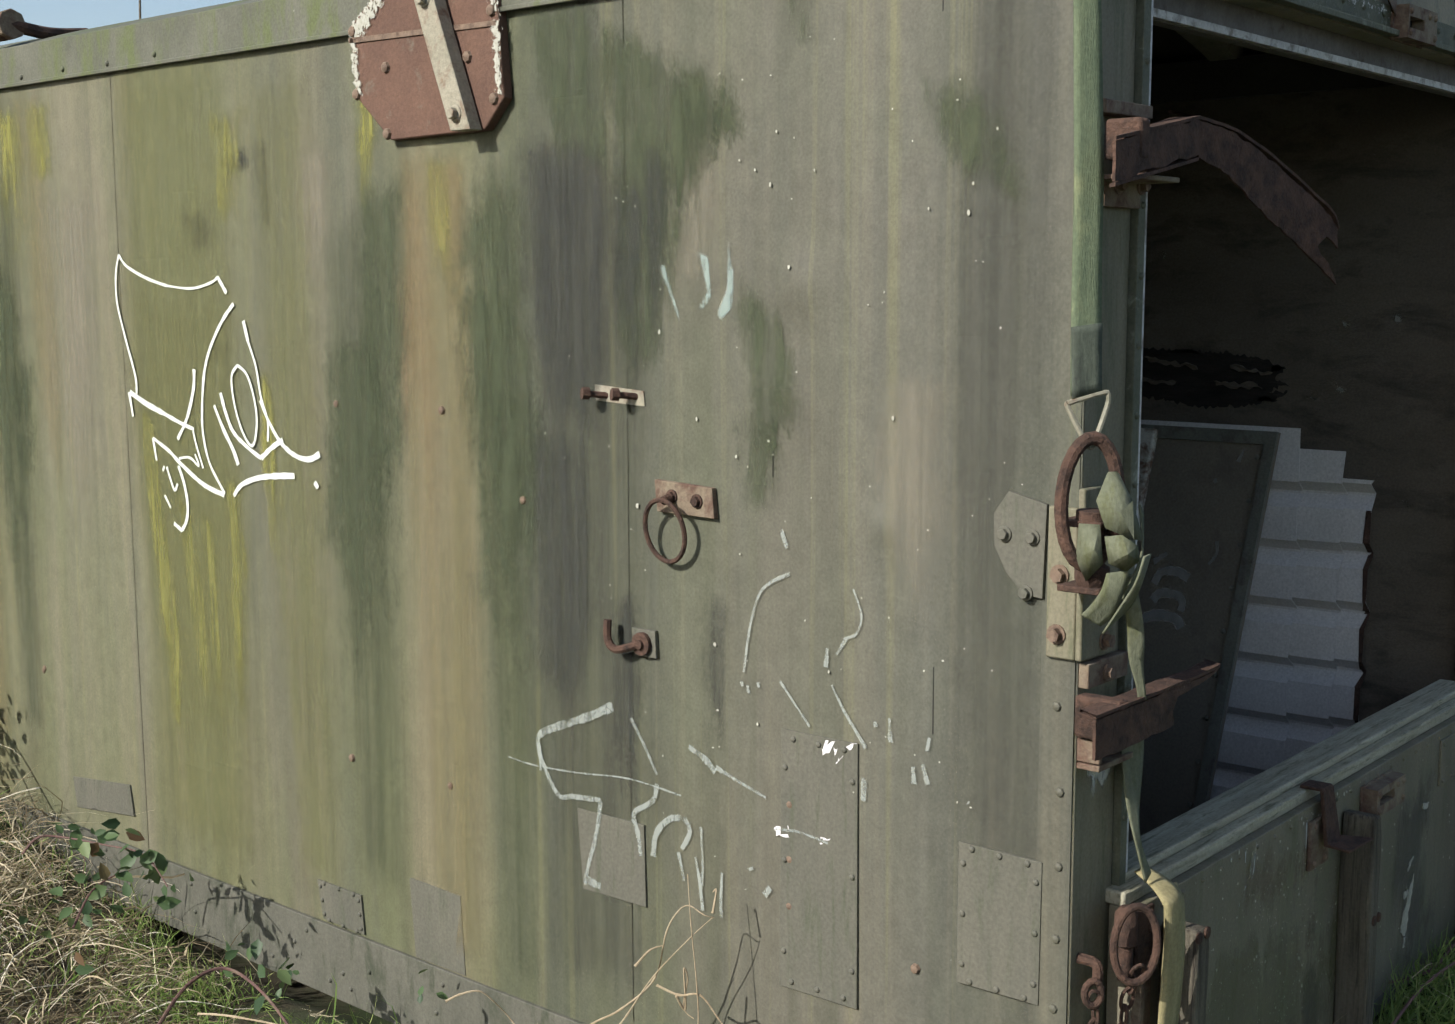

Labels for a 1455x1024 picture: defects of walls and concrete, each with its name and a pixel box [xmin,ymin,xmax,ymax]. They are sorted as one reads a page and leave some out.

leakage [534,7,733,415]
peeling [1400,856,1414,948]